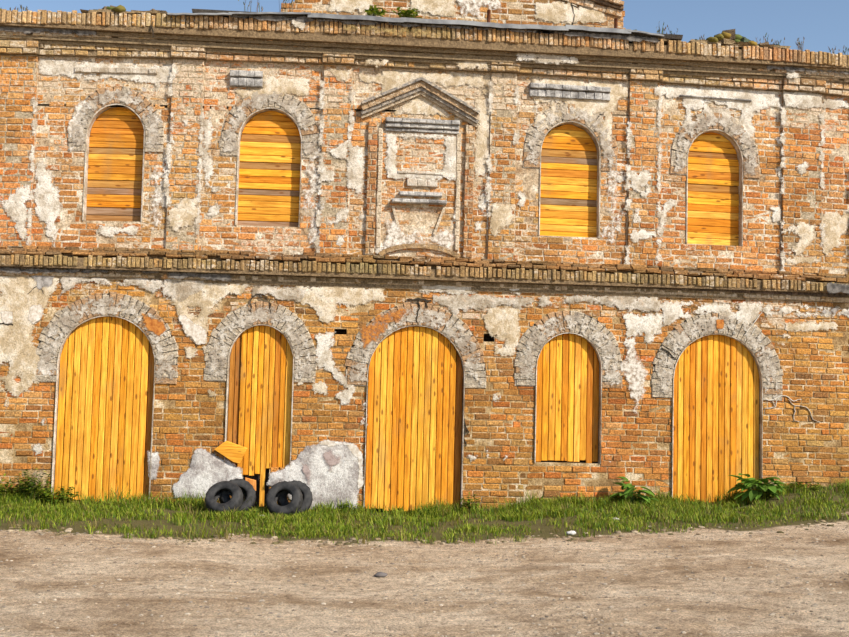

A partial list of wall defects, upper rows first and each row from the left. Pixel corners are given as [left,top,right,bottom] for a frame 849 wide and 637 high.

flaking render [328,0,373,14]
flaking render [409,0,457,18]
flaking render [534,1,606,25]
flaking render [0,119,63,247]
flaking render [37,57,222,237]
flaking render [223,74,365,257]
flaking render [330,59,527,236]
flaking render [654,84,849,175]
peeling [818,129,827,189]
flaking render [770,206,849,271]
flaking render [0,275,849,407]
crack [766,395,819,422]